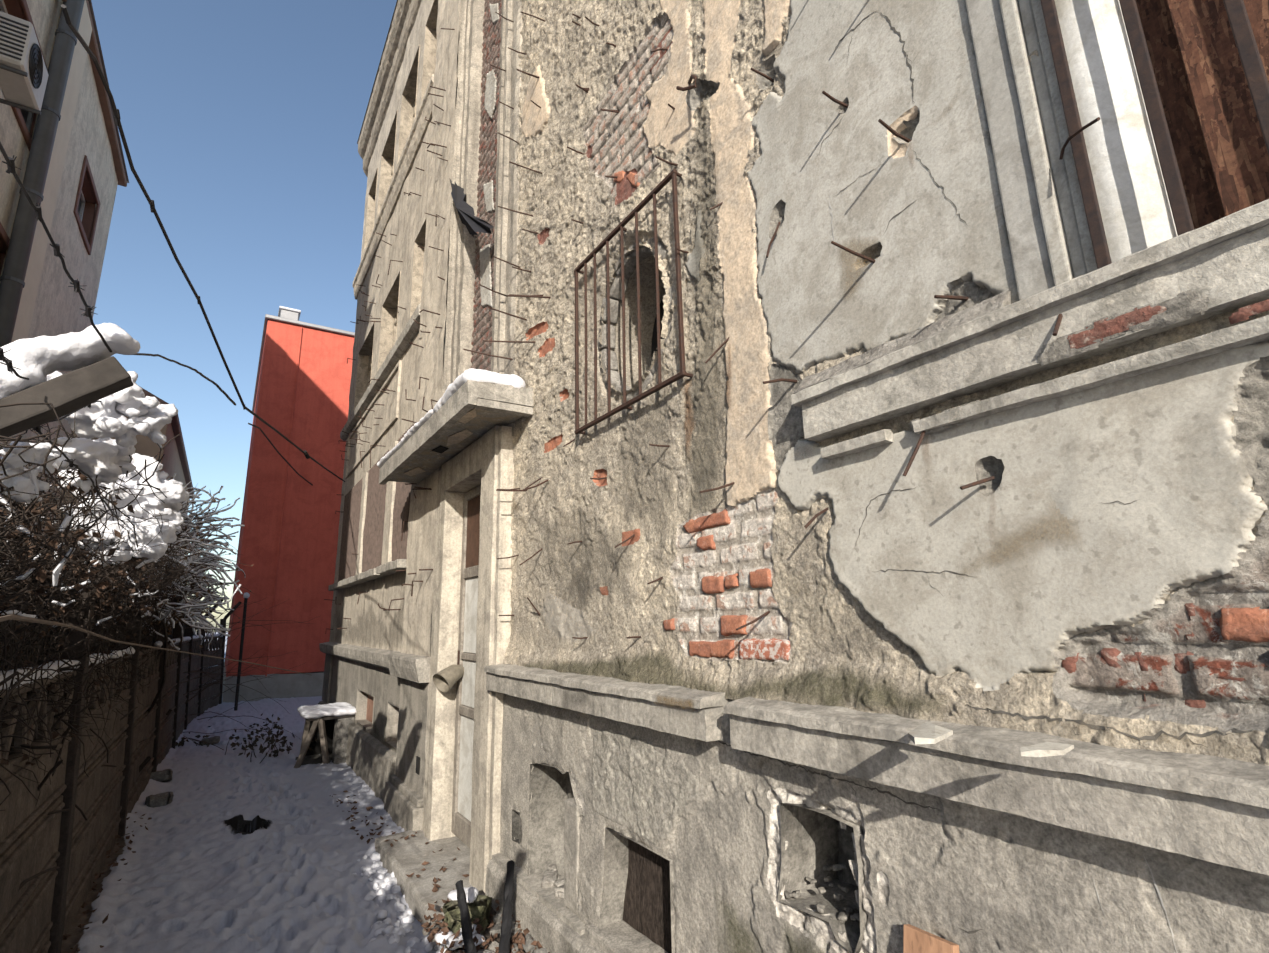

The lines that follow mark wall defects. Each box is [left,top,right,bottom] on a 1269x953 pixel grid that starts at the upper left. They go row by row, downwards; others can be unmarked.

crack [831,11,918,102]
crack [884,151,966,234]
peeling [582,0,804,664]
spalling [1037,289,1210,366]
rust [685,388,693,448]
spalling [1052,356,1269,733]
spalling [766,788,890,953]